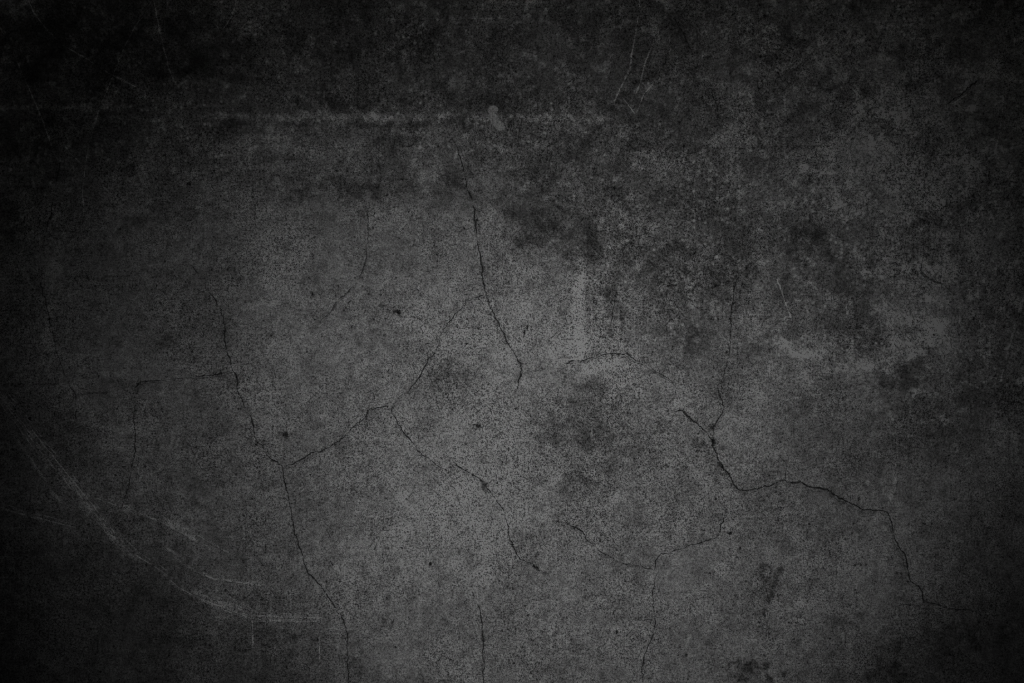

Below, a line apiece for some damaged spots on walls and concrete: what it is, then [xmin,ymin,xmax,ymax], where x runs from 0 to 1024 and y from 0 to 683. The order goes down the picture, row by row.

crack [119,120,982,683]